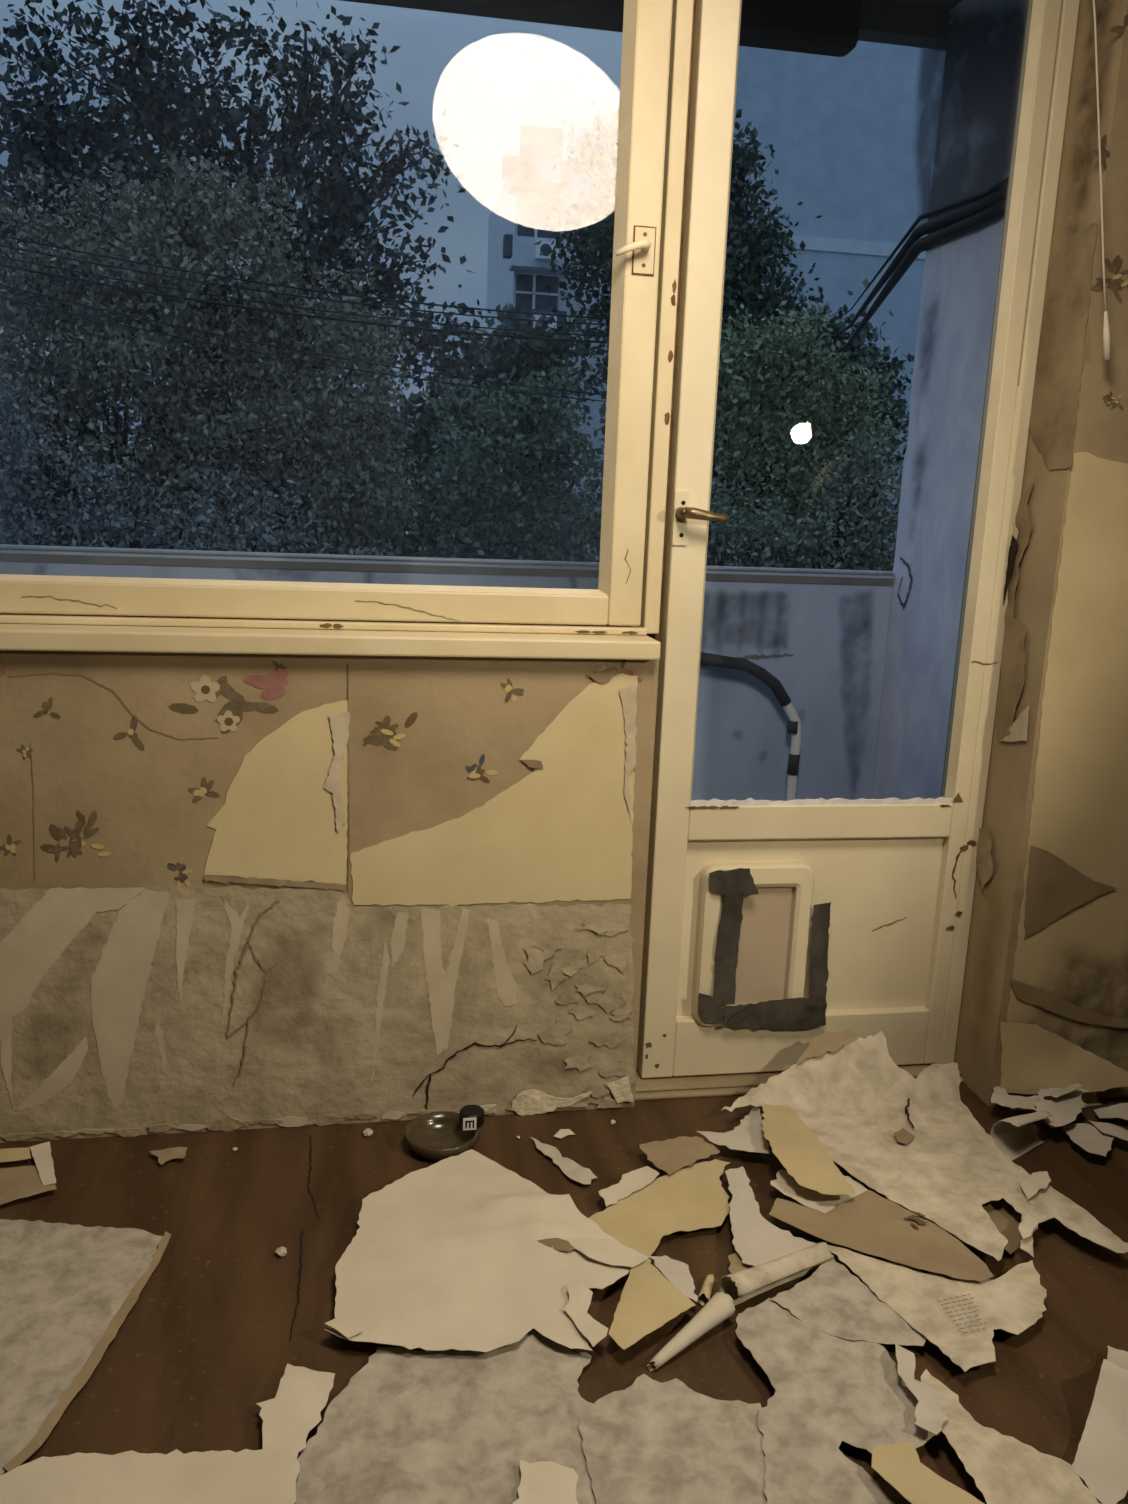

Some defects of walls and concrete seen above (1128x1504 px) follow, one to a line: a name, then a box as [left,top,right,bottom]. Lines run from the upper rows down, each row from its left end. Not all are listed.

peeling [324,712,350,832]
peeling [521,760,543,769]
crack [227,900,279,1085]
flaking render [0,875,667,1143]
crack [413,1025,537,1110]